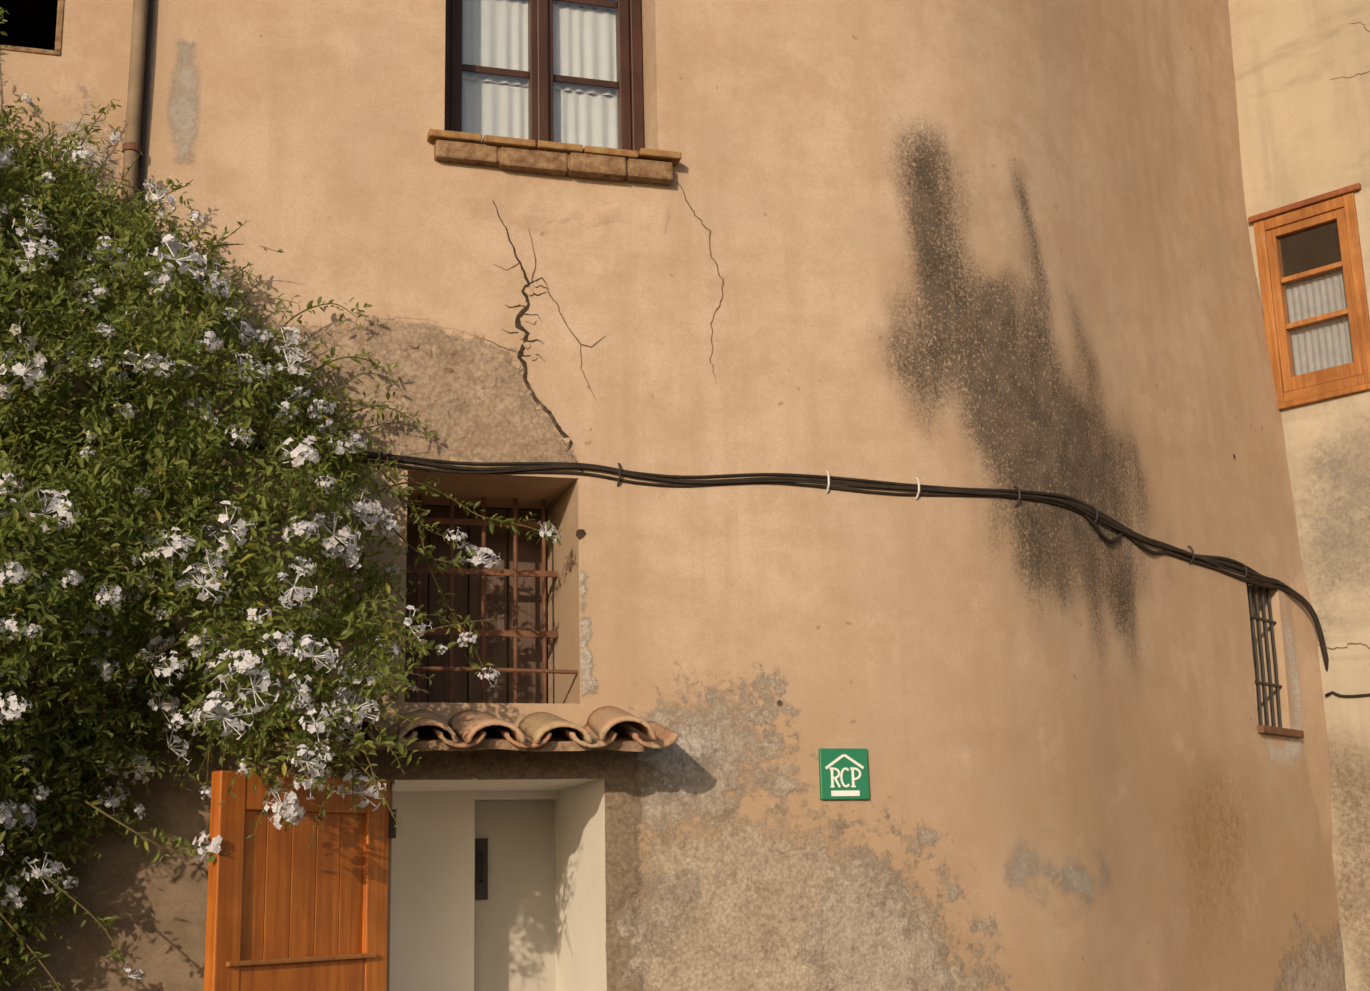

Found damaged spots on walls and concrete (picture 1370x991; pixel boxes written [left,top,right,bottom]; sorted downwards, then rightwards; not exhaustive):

damp [168,42,198,162]
spalling [249,313,576,467]
crack [482,200,604,472]
crack [677,182,724,377]
damp [891,143,1146,631]
peeling [616,672,1009,991]